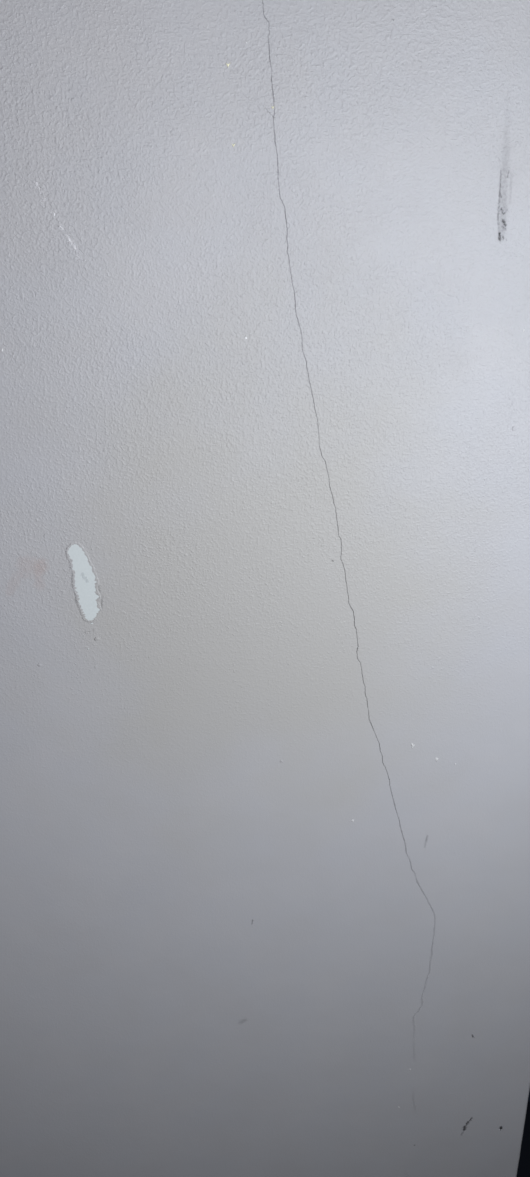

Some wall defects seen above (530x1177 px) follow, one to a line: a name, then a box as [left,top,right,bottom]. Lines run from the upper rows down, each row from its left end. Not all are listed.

peeling [65,542,102,650]